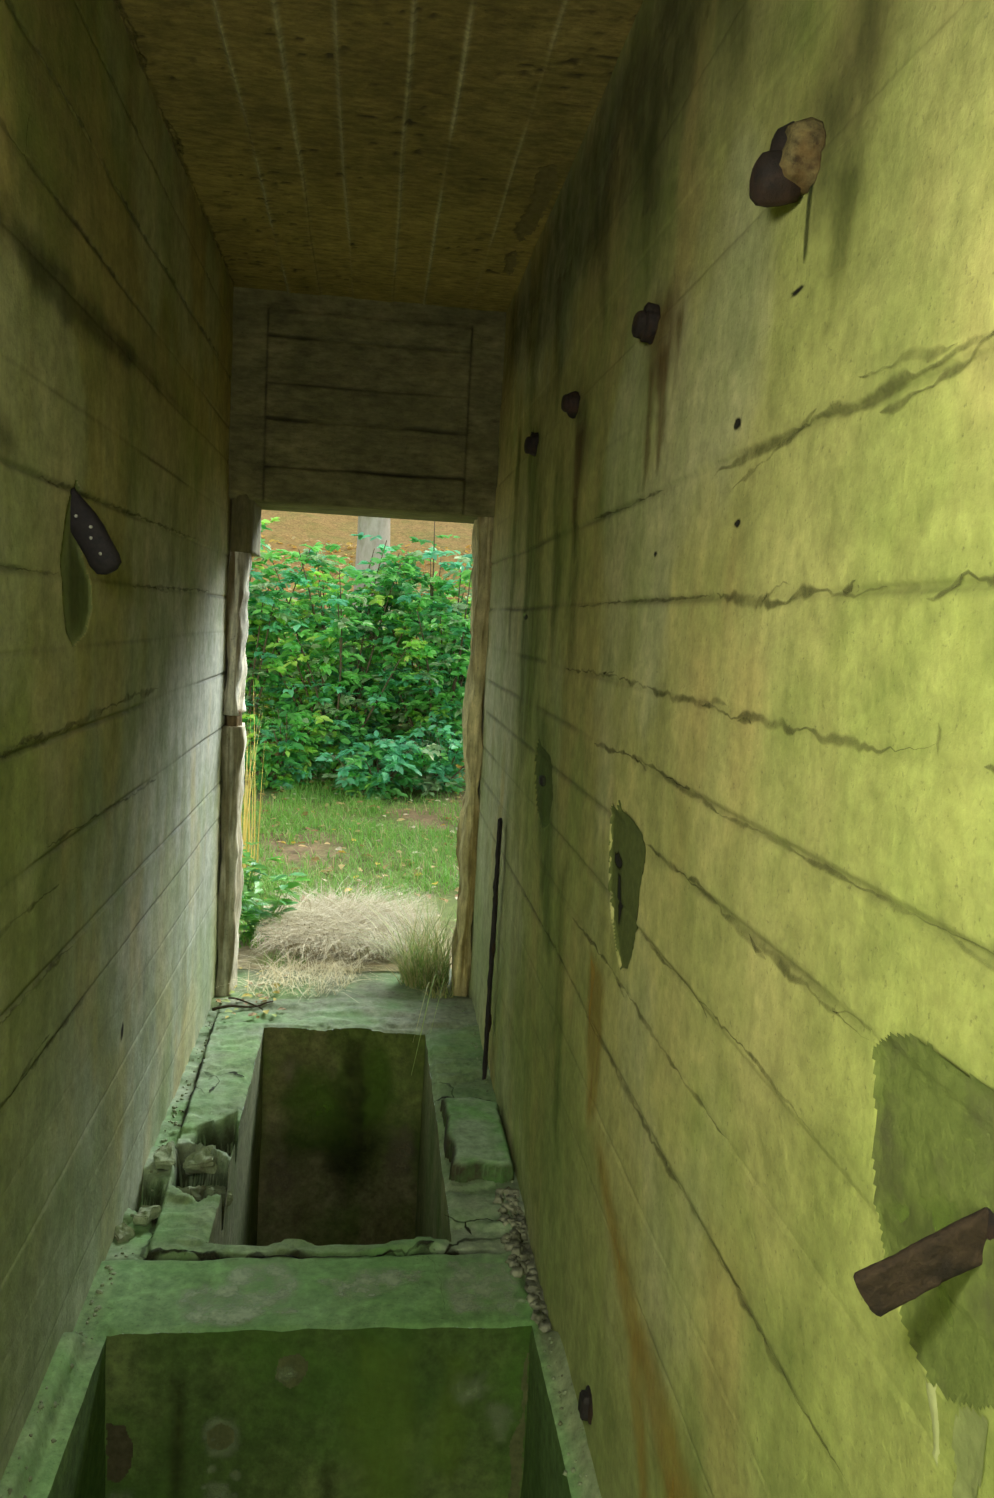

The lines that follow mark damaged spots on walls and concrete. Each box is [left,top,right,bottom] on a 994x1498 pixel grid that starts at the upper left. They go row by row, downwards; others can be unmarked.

leakage [803,184,813,258]
crack [863,347,972,413]
crack [744,412,824,458]
crack [727,580,855,608]
crack [938,570,978,597]
spalling [534,737,553,829]
spalling [608,800,646,971]
spalling [178,1027,451,1246]
spalling [872,1032,994,1259]
spalling [47,1265,572,1498]
spalling [899,1239,994,1498]